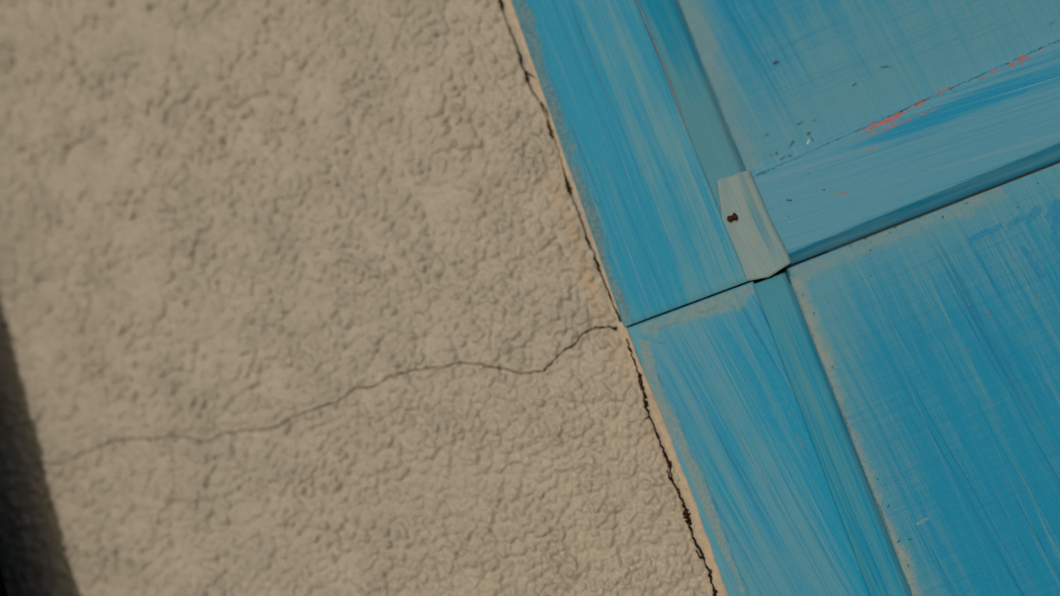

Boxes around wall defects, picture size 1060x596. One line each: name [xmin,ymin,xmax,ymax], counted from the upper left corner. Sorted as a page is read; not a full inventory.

crack [19,0,718,596]